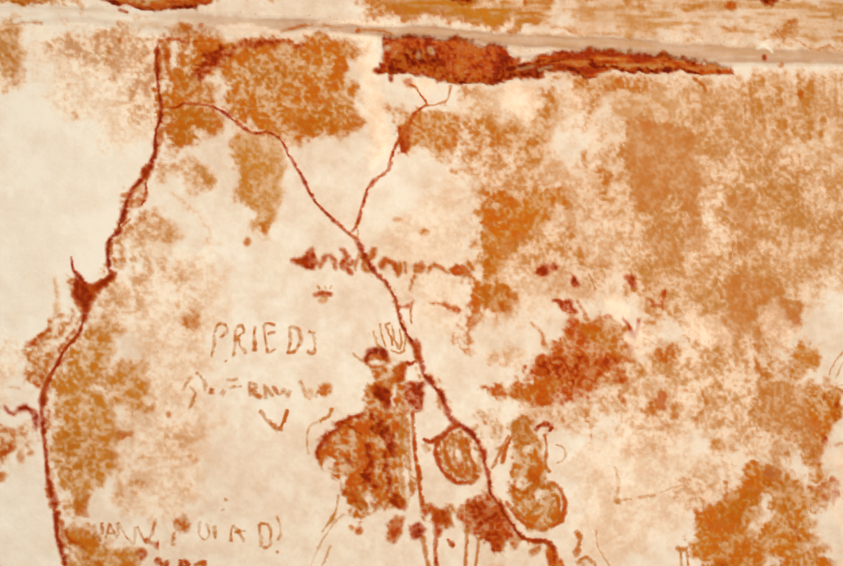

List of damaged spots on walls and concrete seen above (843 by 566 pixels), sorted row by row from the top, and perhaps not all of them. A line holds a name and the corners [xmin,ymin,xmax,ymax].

spalling [105,0,212,13]
rust [154,23,366,152]
spalling [320,21,734,92]
crack [39,41,564,566]
water stain [385,74,843,566]